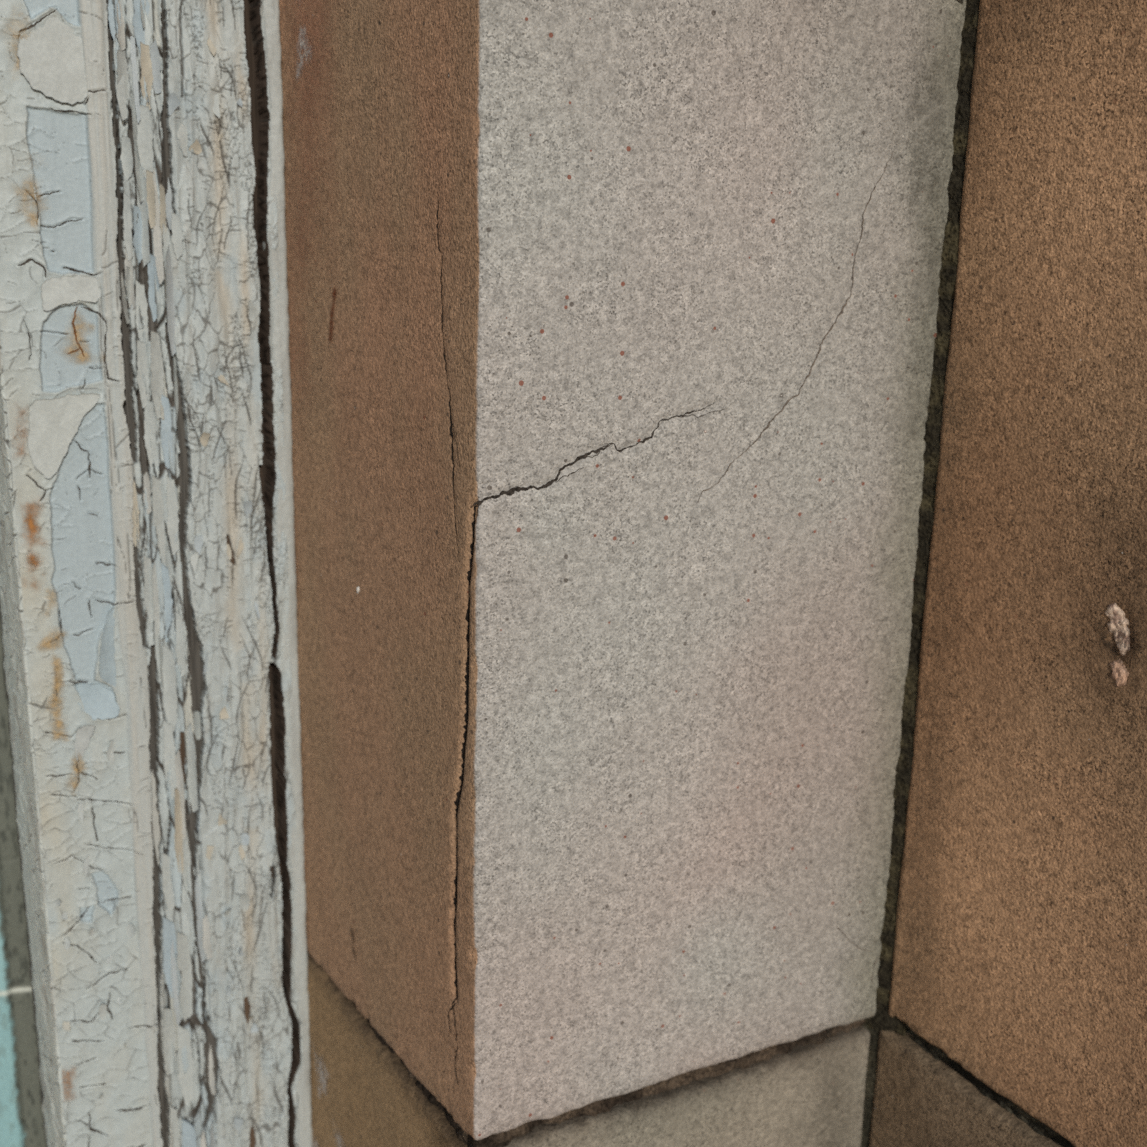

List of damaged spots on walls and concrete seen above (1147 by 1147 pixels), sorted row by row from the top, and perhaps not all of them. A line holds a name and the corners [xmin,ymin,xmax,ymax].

peeling [17,15,88,105]
peeling [41,276,102,311]
crack [697,153,893,503]
peeling [27,393,100,479]
peeling [108,0,216,1147]
peeling [75,609,120,720]
crack [436,203,725,1087]
spalling [1105,603,1131,687]